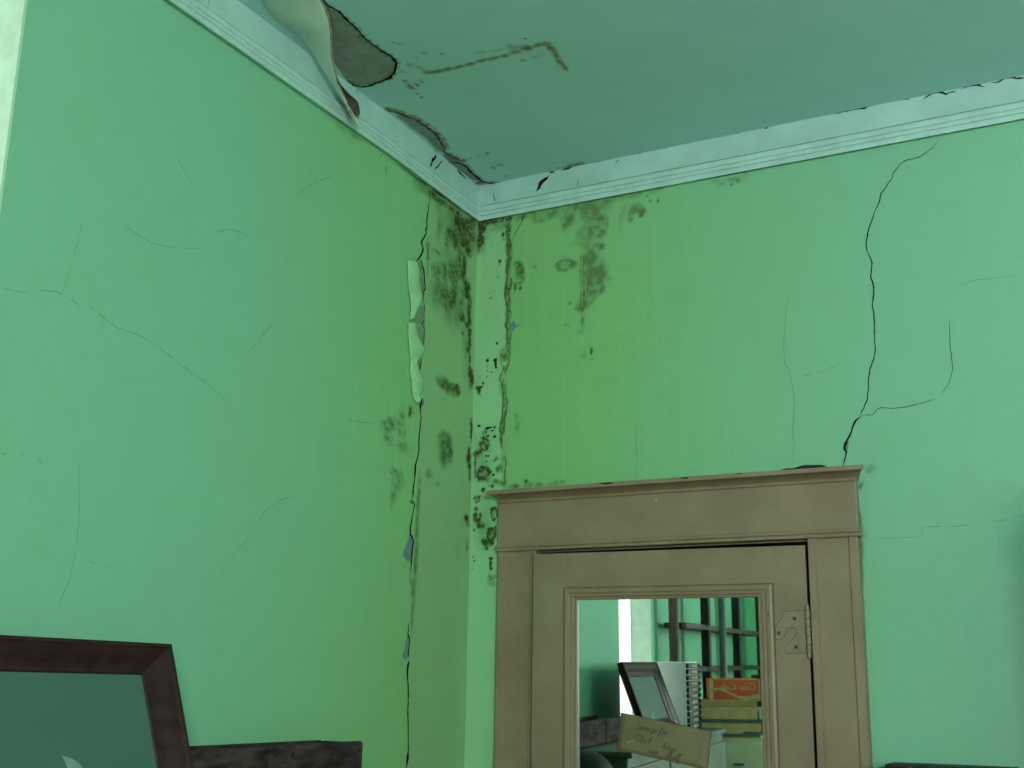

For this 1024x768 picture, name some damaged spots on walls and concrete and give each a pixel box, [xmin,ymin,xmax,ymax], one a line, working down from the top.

flaking render [322,0,398,88]
peeling [407,259,425,407]
damp [421,182,523,396]
damp [557,207,605,323]
crack [843,141,953,465]
crack [410,398,423,577]
mould [441,434,453,462]
mould [465,421,504,578]
crack [404,622,412,766]